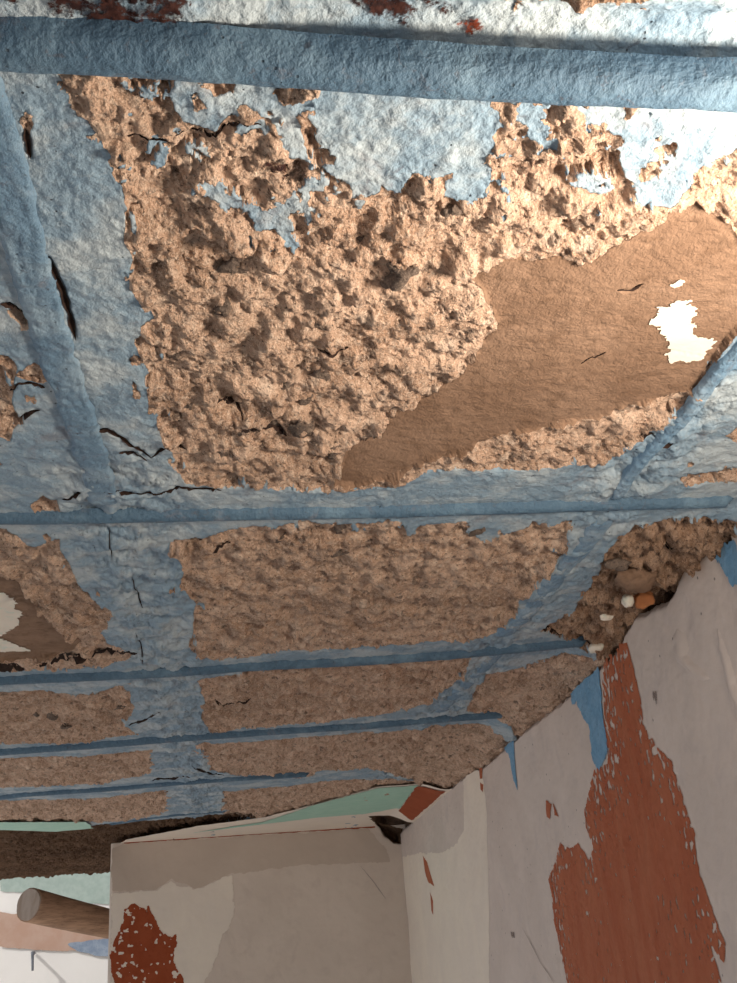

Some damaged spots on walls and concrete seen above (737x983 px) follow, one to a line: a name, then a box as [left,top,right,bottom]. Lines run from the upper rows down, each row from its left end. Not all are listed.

rust [457,18,484,35]
crack [23,129,31,159]
spalling [7,306,29,331]
crack [50,258,76,341]
spalling [57,74,737,495]
spalling [0,355,47,441]
crack [99,428,187,461]
peeling [0,516,737,983]